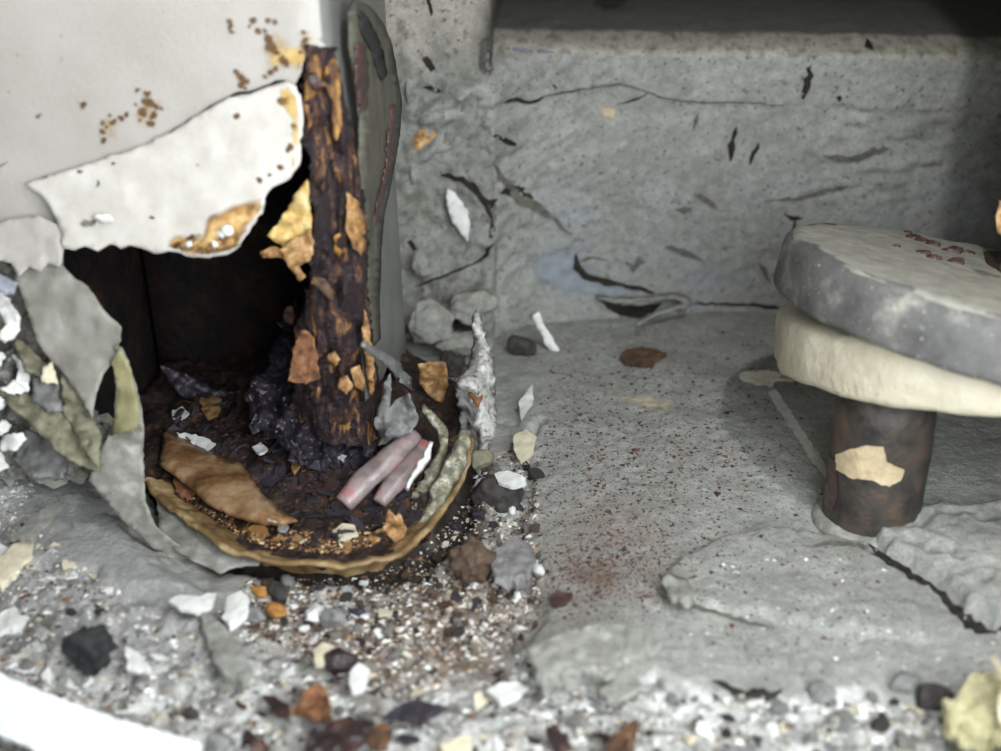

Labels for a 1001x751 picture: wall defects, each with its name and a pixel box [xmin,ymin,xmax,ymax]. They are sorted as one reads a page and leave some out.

rust [99,88,163,144]
rust [234,69,250,90]
flaking render [422,56,436,72]
rust [414,129,445,150]
crack [503,81,784,106]
peeling [24,81,304,258]
rust [248,17,398,449]
crack [415,173,498,287]
peeling [446,188,470,242]
crack [693,302,780,310]
crack [813,540,1001,635]